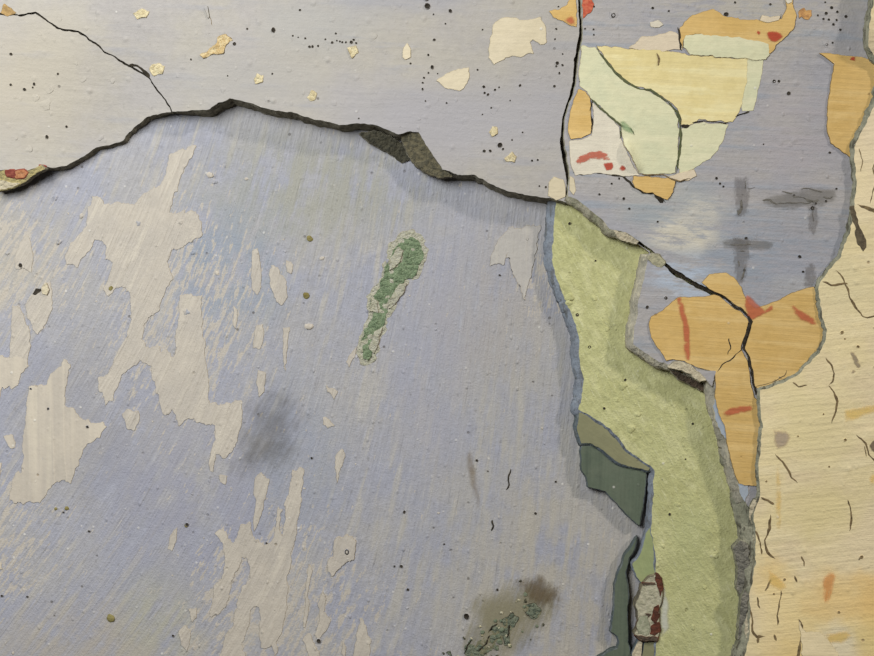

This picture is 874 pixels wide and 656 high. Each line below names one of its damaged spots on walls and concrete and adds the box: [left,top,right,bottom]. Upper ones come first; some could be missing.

crack [0,12,170,107]
peeling [0,0,580,205]
crack [561,0,749,203]
peeling [15,236,33,272]
peeling [0,282,107,505]
peeling [65,145,243,485]
peeling [543,0,874,656]
crack [652,252,807,395]
crack [823,271,874,319]
crack [849,149,874,251]
peeling [209,467,304,656]
crack [750,497,805,656]